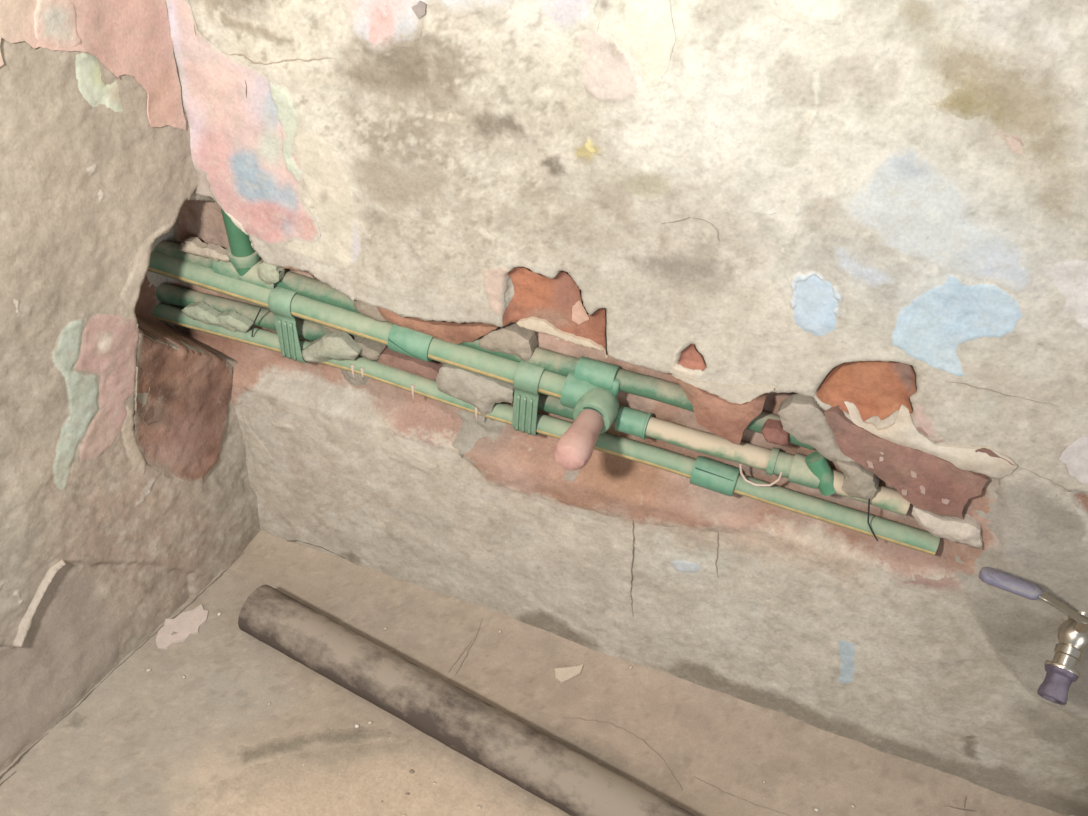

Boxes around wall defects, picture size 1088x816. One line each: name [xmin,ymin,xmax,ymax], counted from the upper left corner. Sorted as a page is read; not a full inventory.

water stain [327,47,532,143]
water stain [343,146,456,223]
water stain [537,136,605,179]
spalling [0,0,1018,598]
peeling [1038,258,1088,330]
peeling [1059,435,1088,517]
crack [629,519,637,617]
crack [572,718,790,816]